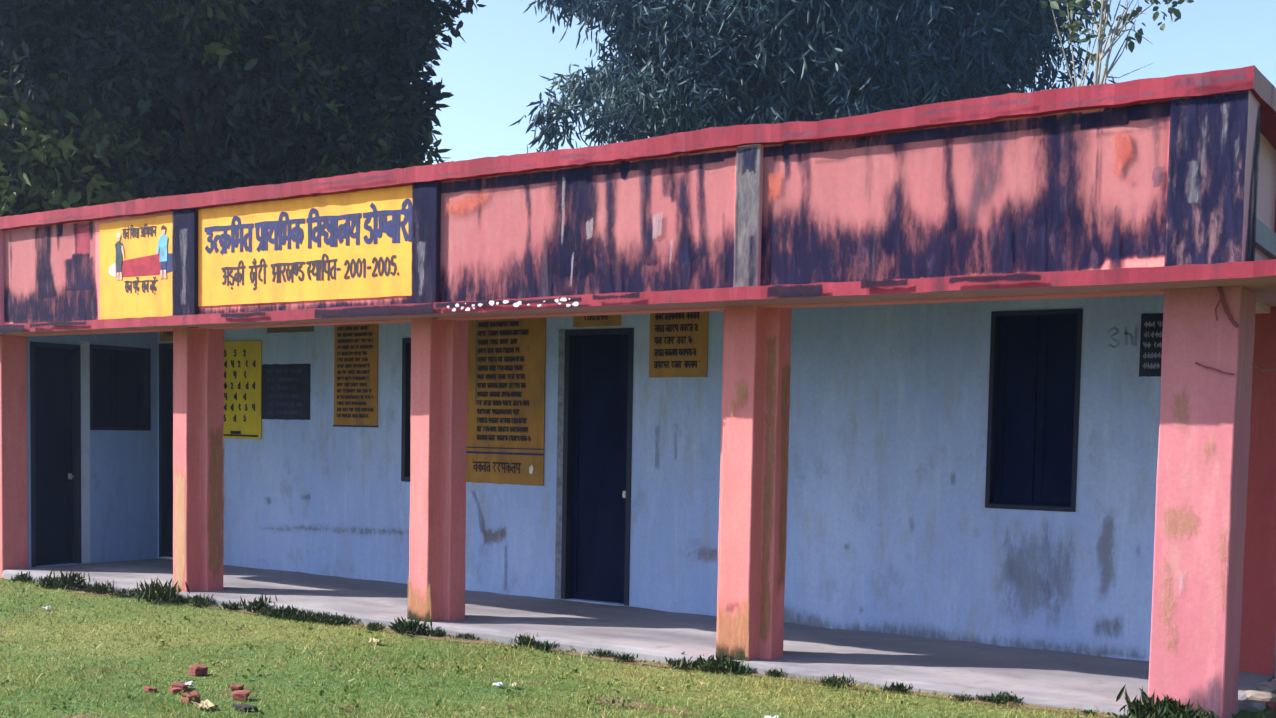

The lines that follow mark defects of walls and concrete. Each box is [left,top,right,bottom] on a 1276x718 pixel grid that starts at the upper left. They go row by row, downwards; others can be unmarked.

damp [0,216,97,333]
damp [172,71,1261,319]